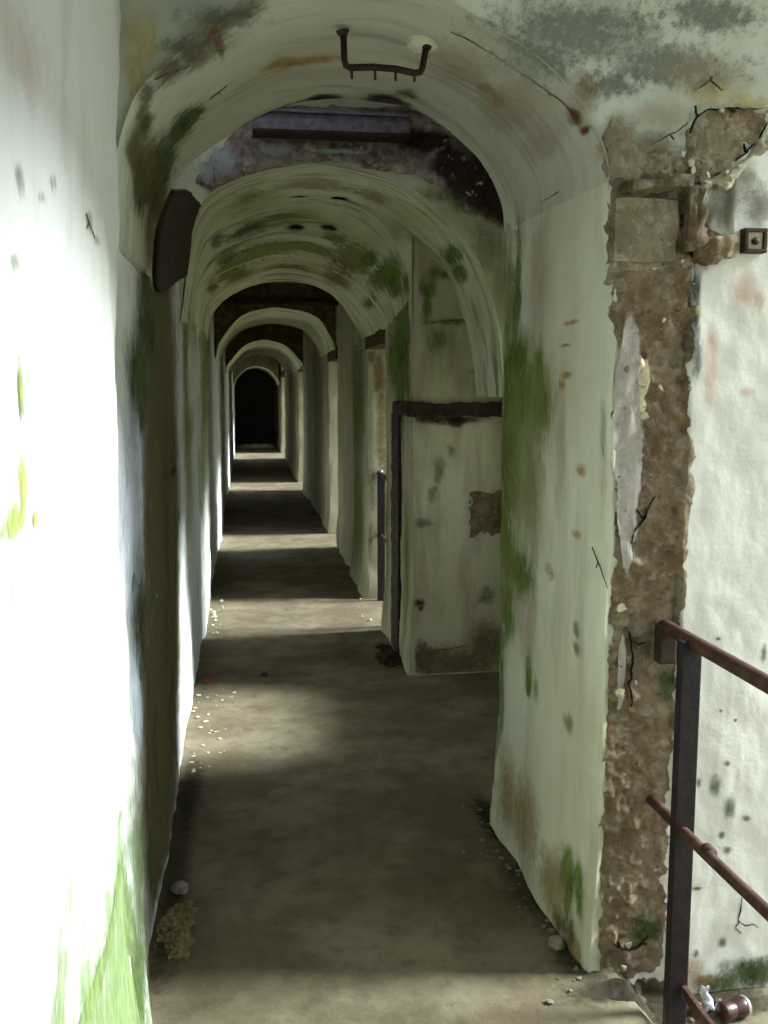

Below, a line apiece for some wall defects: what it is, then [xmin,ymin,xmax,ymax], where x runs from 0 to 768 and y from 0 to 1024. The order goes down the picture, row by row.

spalling [196,95,477,192]
rust [569,109,588,134]
crack [651,76,768,161]
spalling [469,490,502,538]
damp [121,129,200,965]
crack [592,547,608,589]
spalling [598,107,768,979]
damp [415,623,501,674]
crack [735,898,758,933]